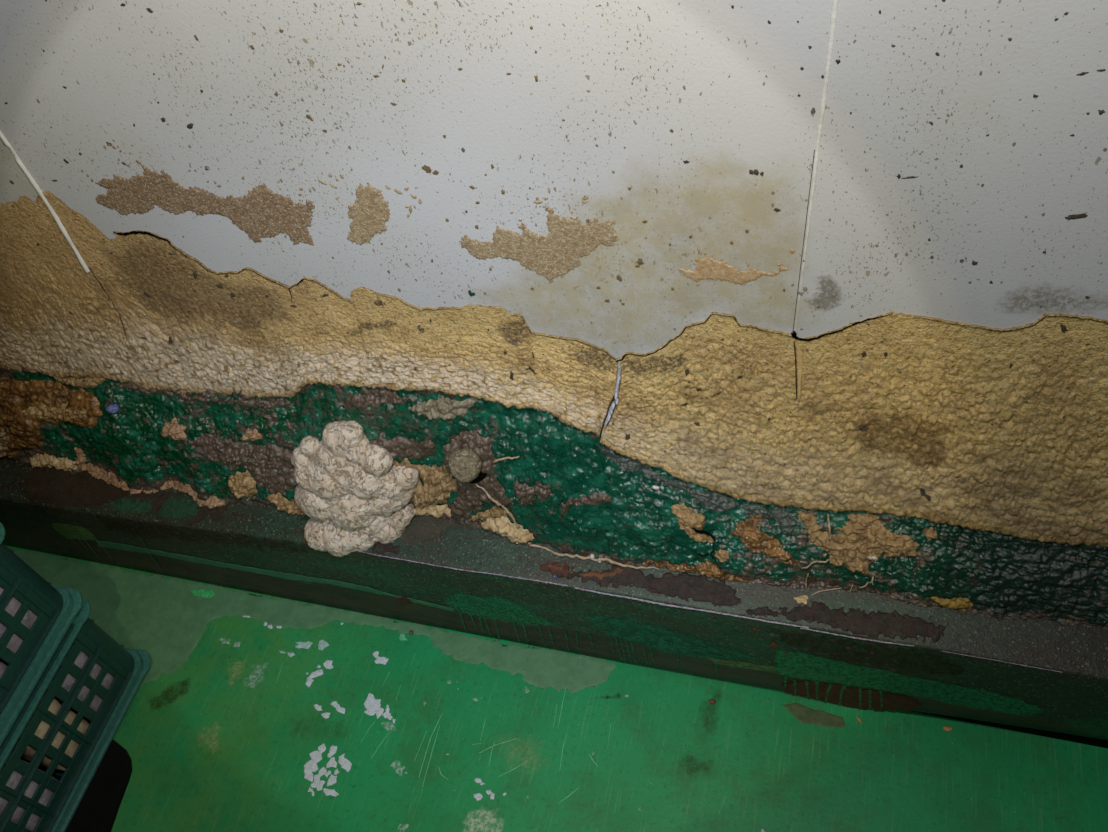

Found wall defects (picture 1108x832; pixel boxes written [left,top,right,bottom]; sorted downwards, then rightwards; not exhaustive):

peeling [81,144,344,246]
crack [113,231,349,302]
peeling [0,182,938,583]
crack [521,313,1108,400]
peeling [314,701,345,719]
peeling [364,693,396,731]
corrosion [781,681,921,711]
peeling [304,743,352,796]
peeling [474,778,506,801]